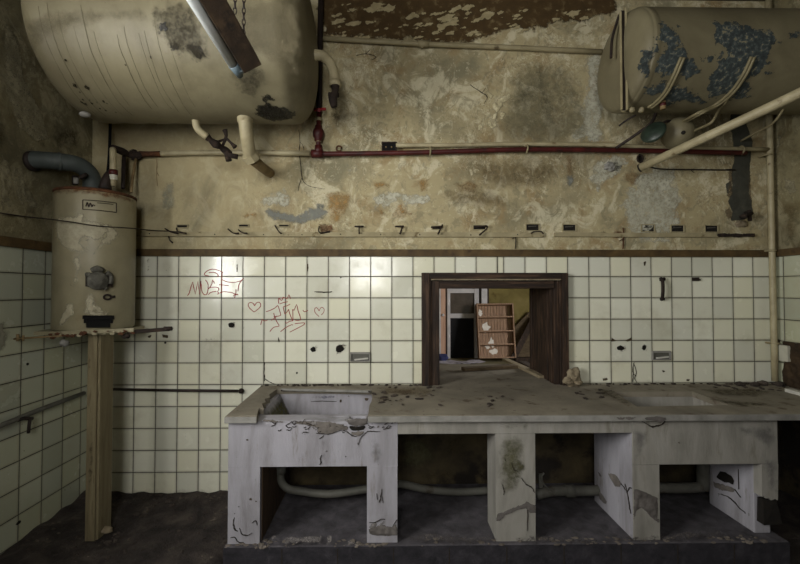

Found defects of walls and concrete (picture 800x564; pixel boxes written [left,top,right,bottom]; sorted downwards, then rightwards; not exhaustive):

peeling [317,0,617,42]
peeling [266,195,349,223]
spalling [296,418,367,444]
leakage [503,441,523,488]
crack [502,459,535,530]
crack [621,483,632,514]
flaking render [634,489,659,522]